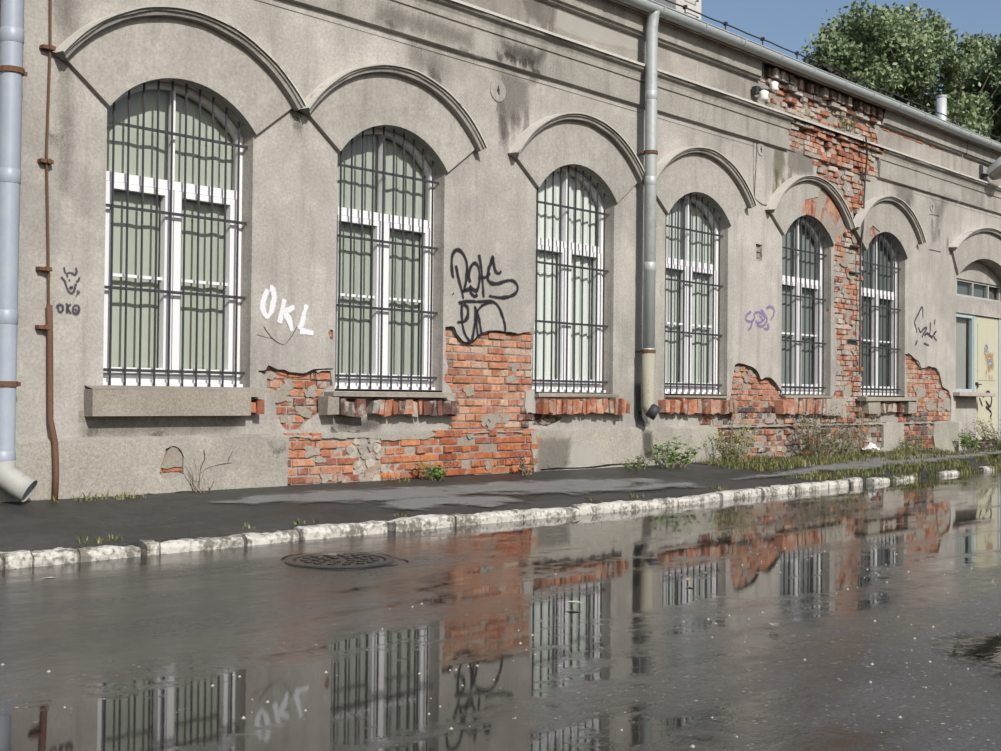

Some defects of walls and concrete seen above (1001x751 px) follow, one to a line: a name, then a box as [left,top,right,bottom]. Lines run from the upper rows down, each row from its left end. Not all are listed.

peeling [251,327,630,485]
peeling [658,64,950,459]